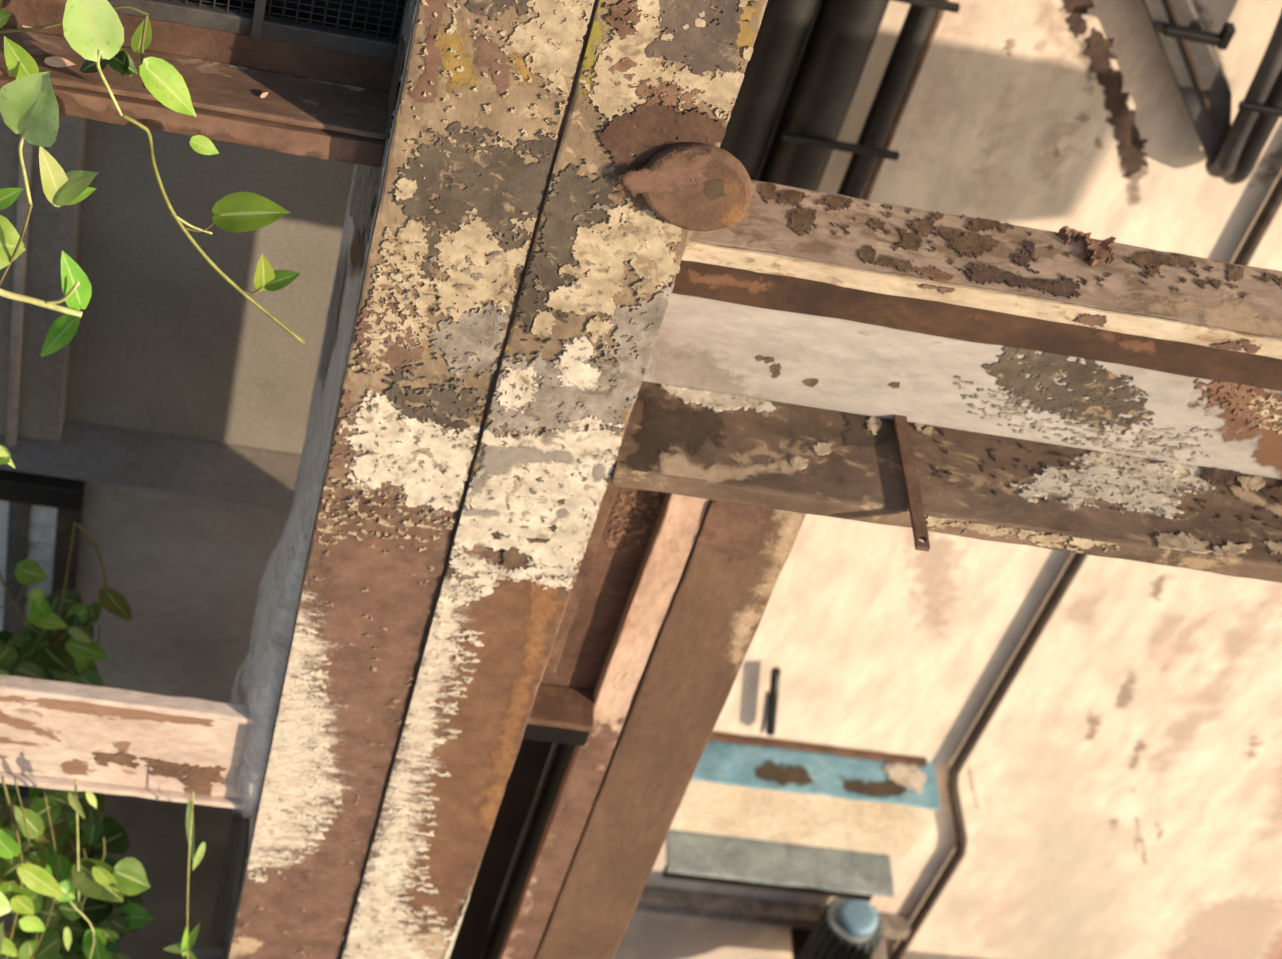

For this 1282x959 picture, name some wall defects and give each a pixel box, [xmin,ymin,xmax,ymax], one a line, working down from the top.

rust [604,0,641,40]
rust [596,56,750,231]
flaking render [1064,0,1148,178]
peeling [759,182,1282,299]
peeling [317,0,785,959]
peeling [789,438,838,474]
peeling [925,346,1282,564]
rust [1187,378,1282,503]
peeling [207,614,387,959]
rust [233,512,579,959]
rust [504,710,625,959]
peeling [883,763,927,794]